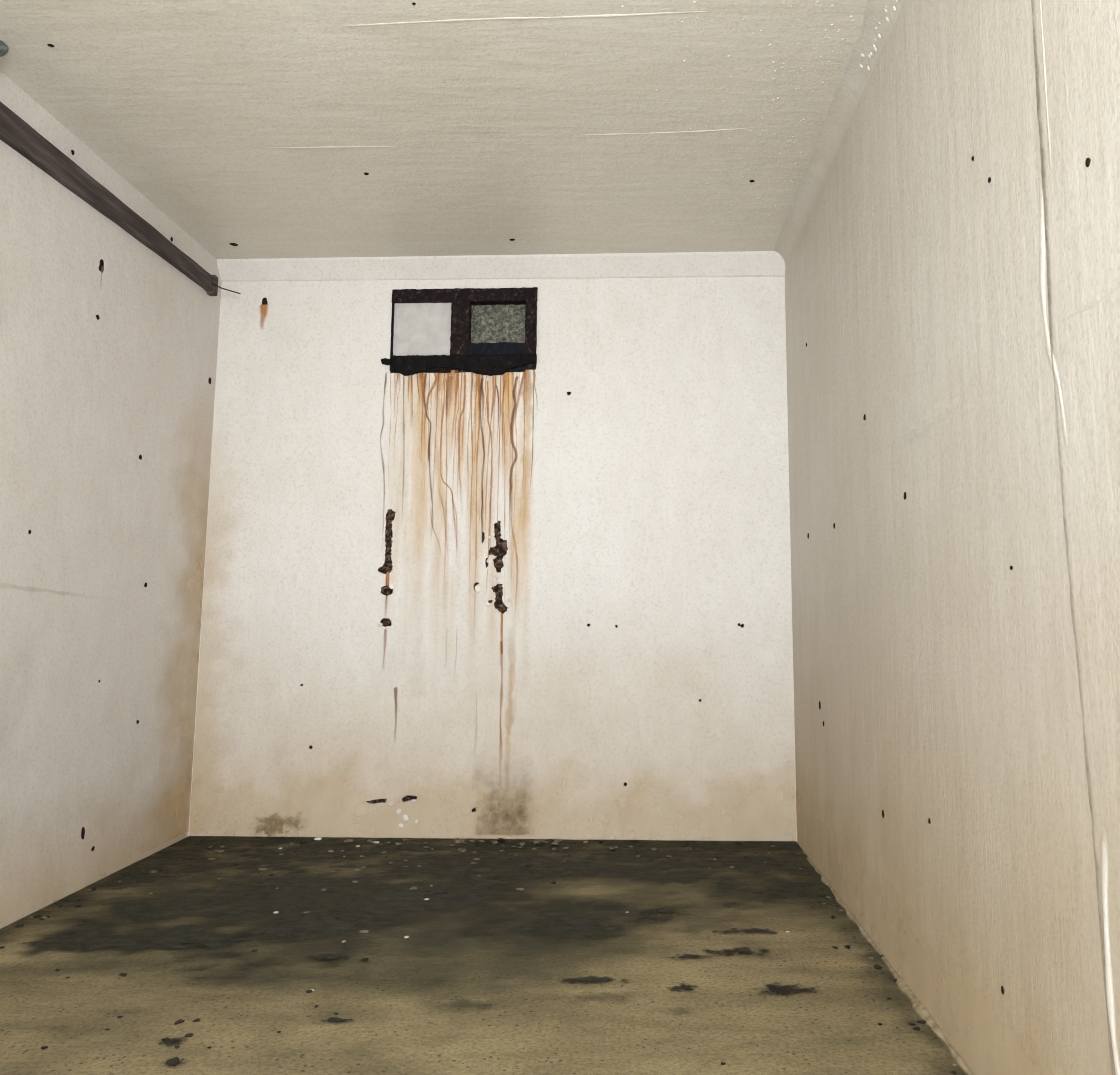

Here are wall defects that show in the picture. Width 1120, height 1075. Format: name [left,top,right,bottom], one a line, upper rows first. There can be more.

crack [1032,0,1068,447]
corrosion [381,369,536,520]
damp [159,1037,186,1045]
damp [0,804,861,988]
damp [669,983,698,991]
damp [762,982,816,995]
crack [1090,806,1120,1075]